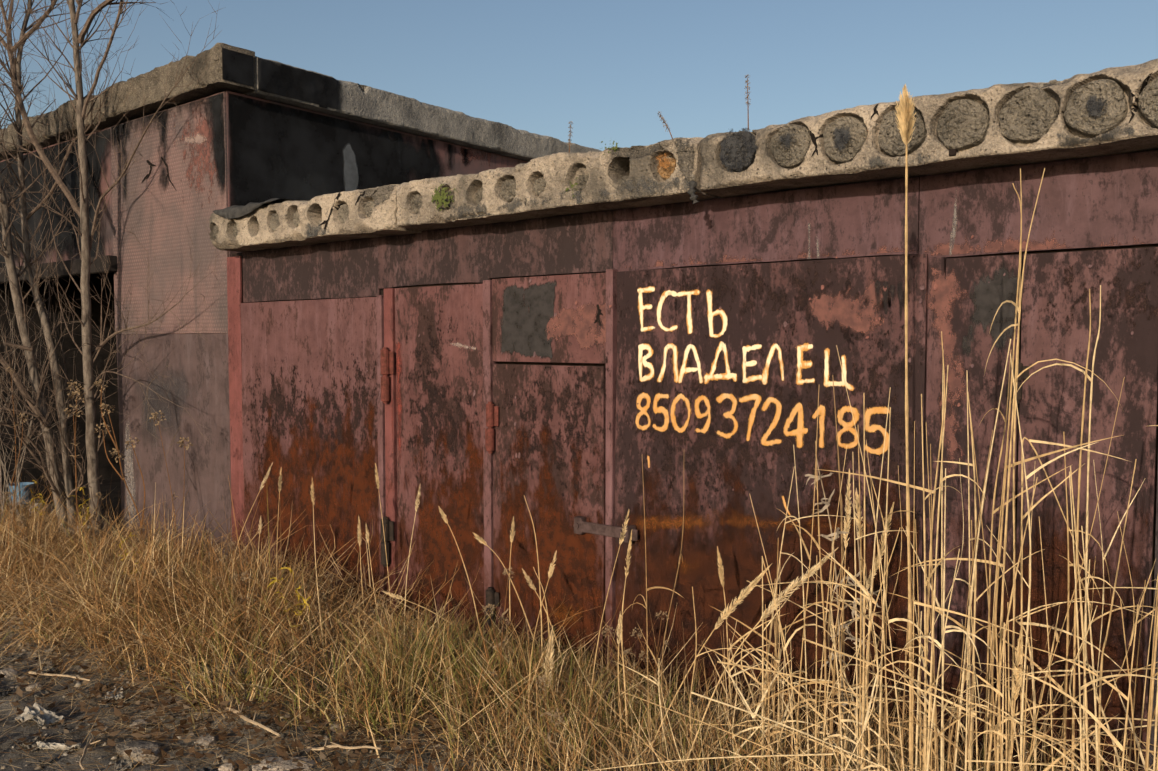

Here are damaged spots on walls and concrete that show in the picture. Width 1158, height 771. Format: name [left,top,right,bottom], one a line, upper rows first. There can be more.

water stain [158,111,168,187]
water stain [185,134,206,144]
peeling [498,230,1158,530]
rust [244,381,483,631]
rust [498,426,603,665]
rust [617,464,919,753]